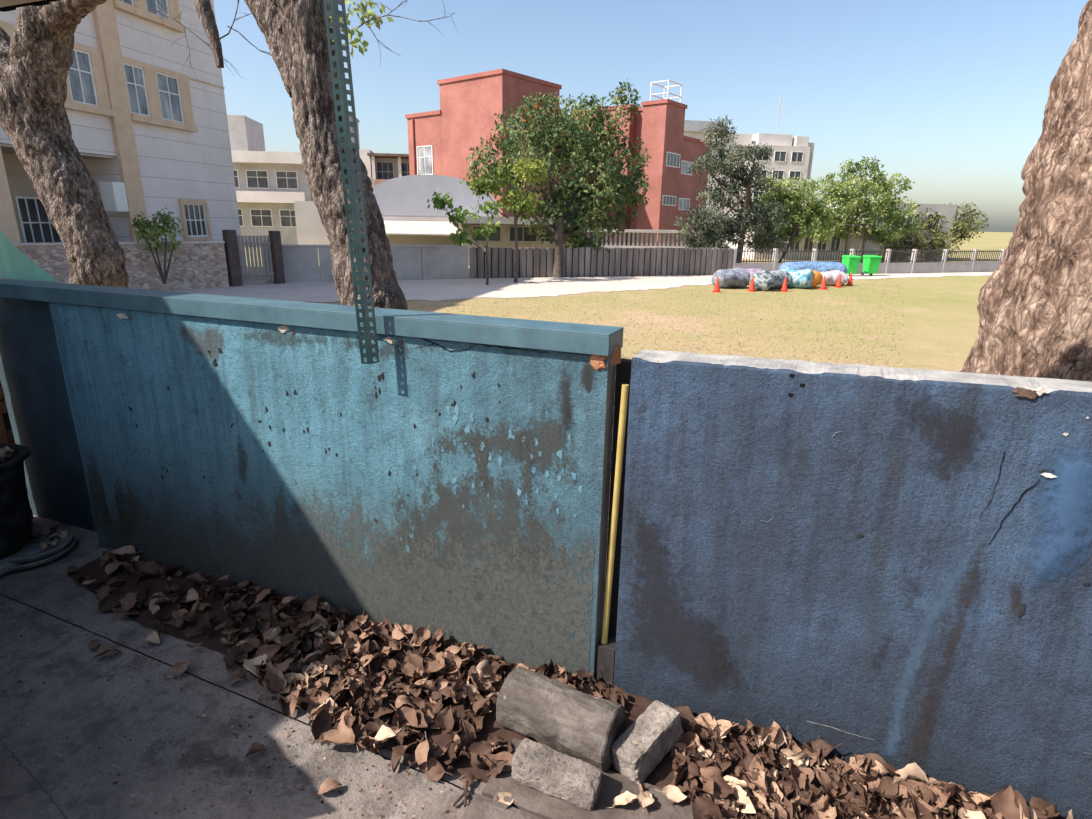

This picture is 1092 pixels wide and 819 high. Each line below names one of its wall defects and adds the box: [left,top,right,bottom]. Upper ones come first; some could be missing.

leakage [582,364,594,391]
leakage [99,371,594,681]
crack [979,450,1040,544]